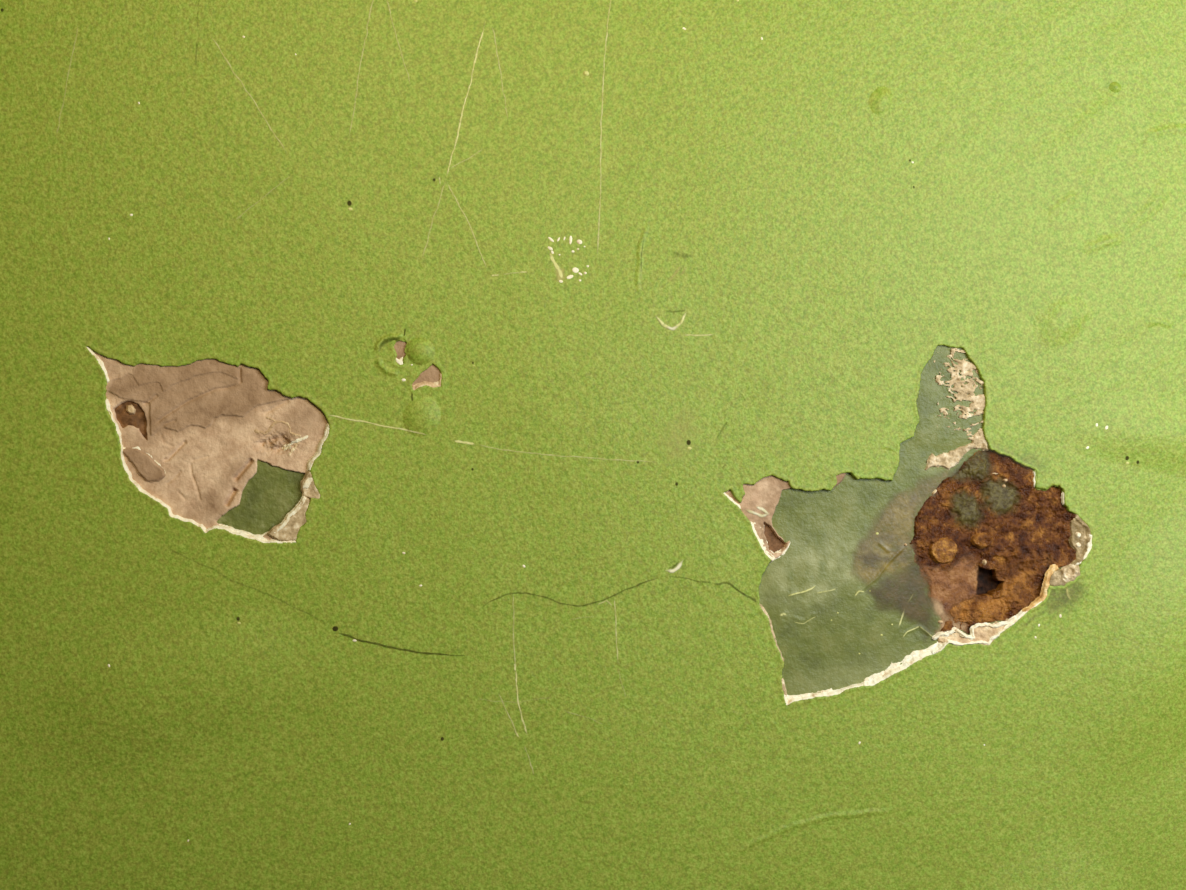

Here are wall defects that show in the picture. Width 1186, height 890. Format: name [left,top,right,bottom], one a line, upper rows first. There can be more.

peeling [86,347,330,543]
peeling [373,330,442,401]
peeling [724,345,1092,705]
crack [332,626,441,655]